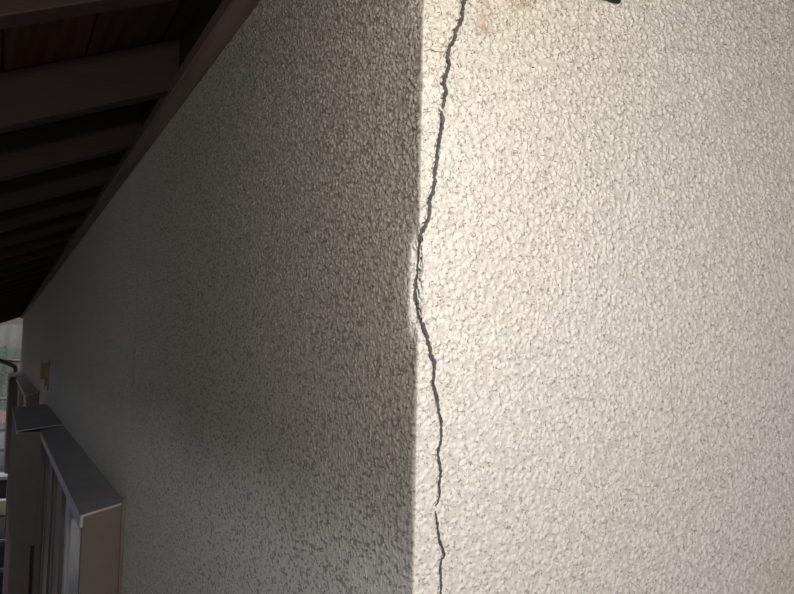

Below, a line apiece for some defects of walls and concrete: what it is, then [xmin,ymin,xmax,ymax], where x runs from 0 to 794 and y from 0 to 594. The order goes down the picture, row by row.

crack [413,0,467,594]